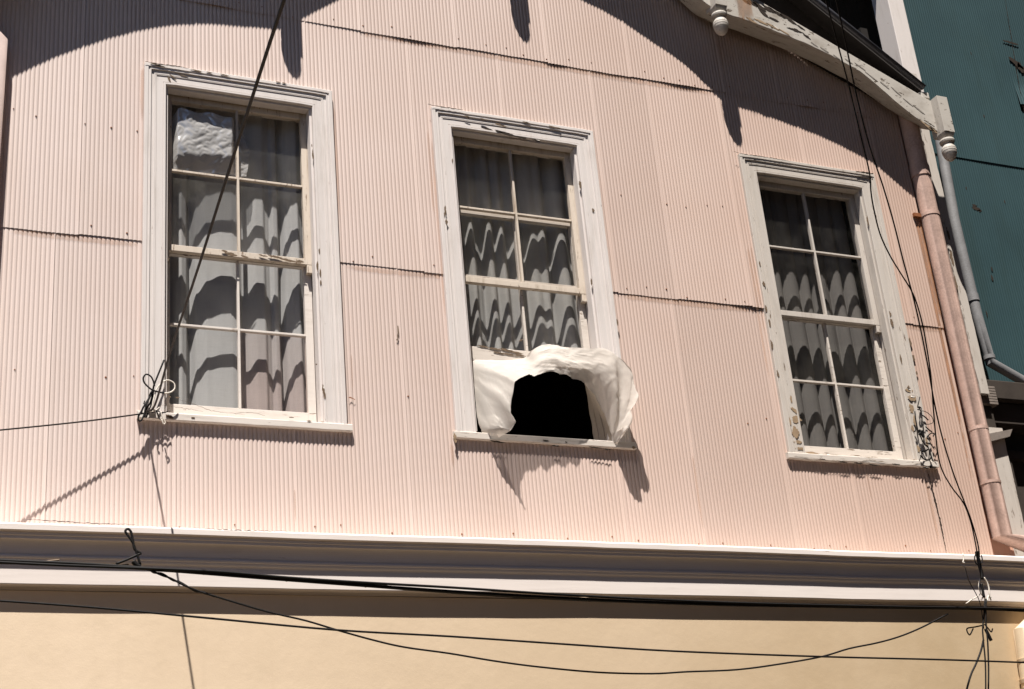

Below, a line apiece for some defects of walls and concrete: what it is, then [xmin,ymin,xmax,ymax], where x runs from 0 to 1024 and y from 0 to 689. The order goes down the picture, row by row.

peeling [743,0,938,134]
peeling [464,115,541,142]
peeling [900,338,918,431]